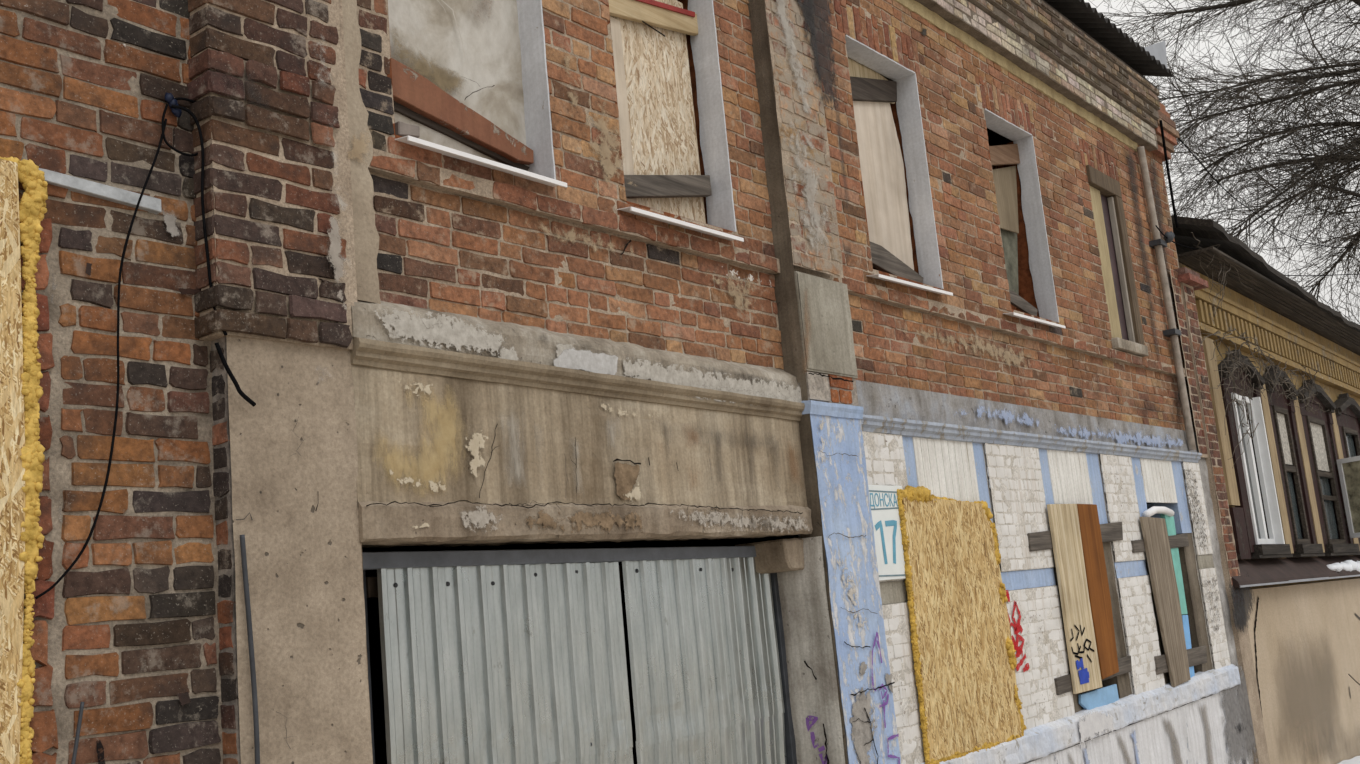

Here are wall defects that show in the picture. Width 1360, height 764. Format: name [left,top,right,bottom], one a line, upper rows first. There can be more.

leakage [777,0,811,113]
leakage [789,122,828,252]
peeling [375,309,519,361]
peeling [554,343,802,406]
peeling [383,381,489,492]
peeling [461,505,502,532]
crack [366,424,803,527]
spalling [526,459,643,533]
peeling [670,510,809,533]
crack [823,682,895,764]